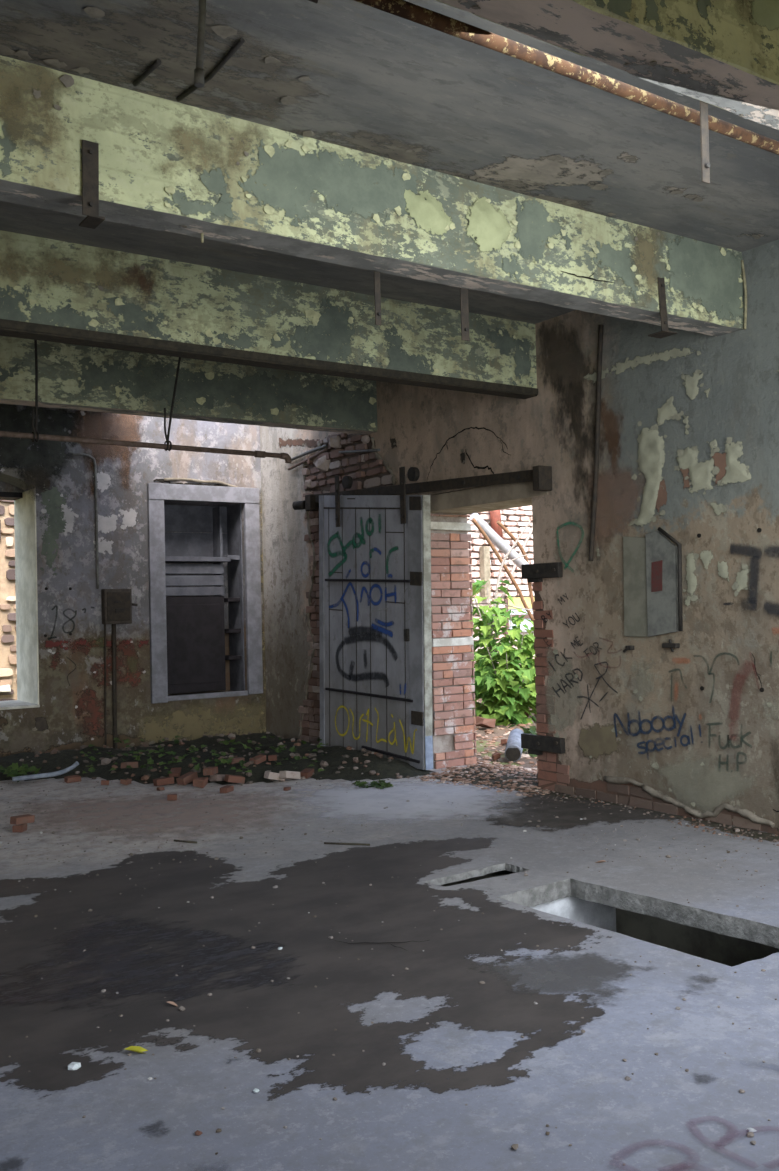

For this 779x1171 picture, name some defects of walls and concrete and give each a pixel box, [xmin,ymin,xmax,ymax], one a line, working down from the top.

peeling [595,0,670,32]
peeling [697,0,716,35]
peeling [620,49,779,126]
spalling [0,0,638,282]
peeling [591,239,642,304]
peeling [0,280,171,341]
peeling [204,297,439,375]
peeling [487,327,535,388]
leakage [539,324,596,511]
peeling [584,347,752,556]
leakage [0,837,632,1101]